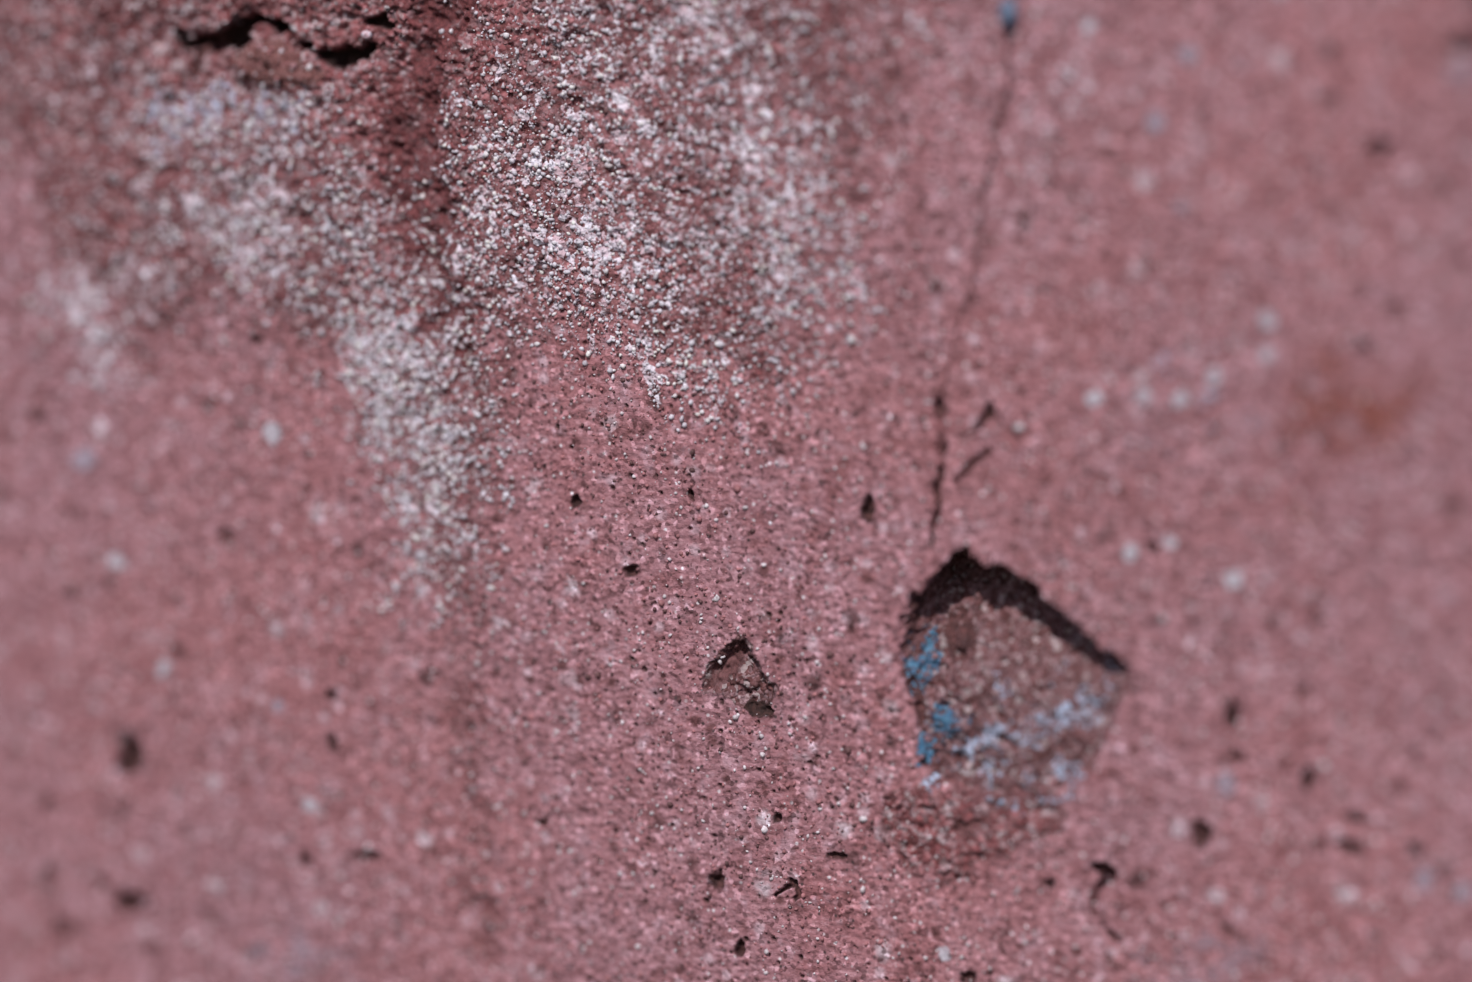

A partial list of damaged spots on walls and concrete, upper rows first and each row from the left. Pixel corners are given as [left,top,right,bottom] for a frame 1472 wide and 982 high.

crack [145,8,396,120]
crack [420,0,457,64]
water stain [18,0,974,630]
crack [931,0,1014,548]
spalling [702,635,779,718]
spalling [883,545,1134,882]